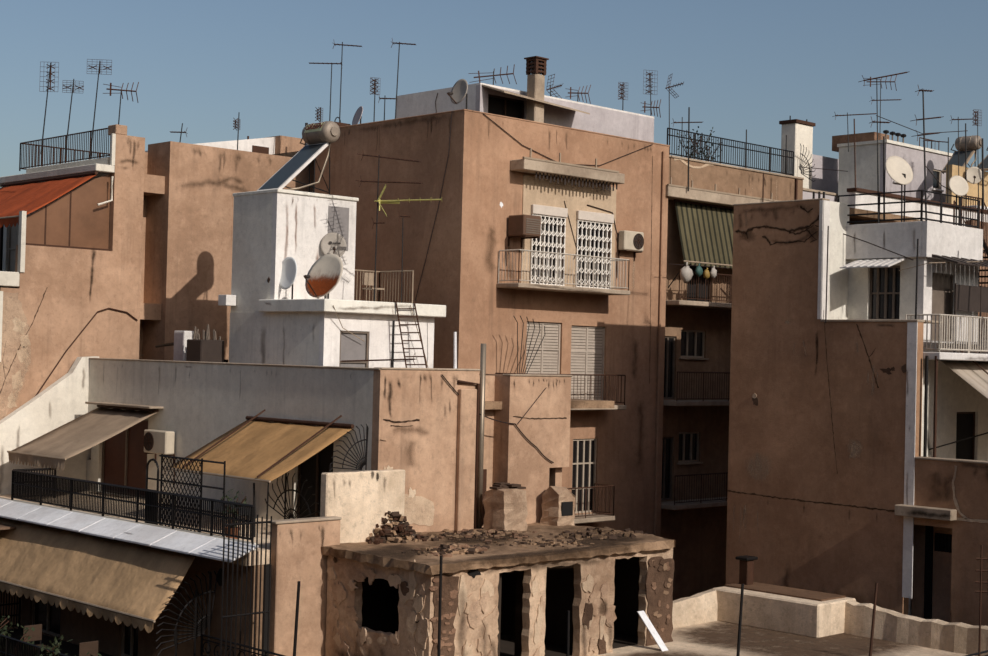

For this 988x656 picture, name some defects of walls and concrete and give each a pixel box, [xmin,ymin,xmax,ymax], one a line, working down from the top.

crack [735,206,819,245]
crack [856,324,879,388]
crack [513,413,567,421]
crack [727,490,895,512]